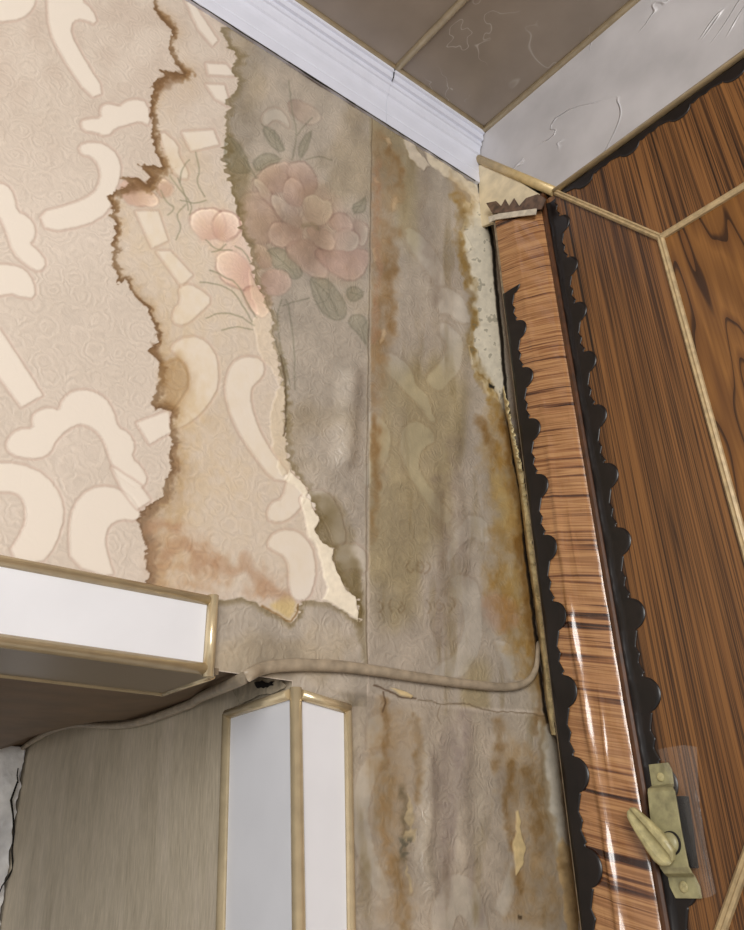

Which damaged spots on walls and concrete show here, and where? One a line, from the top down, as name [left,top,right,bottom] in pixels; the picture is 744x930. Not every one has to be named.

peeling [248,268,309,497]
damp [105,0,537,930]
spalling [402,139,510,403]
crack [0,768,19,892]
peeling [511,809,527,877]